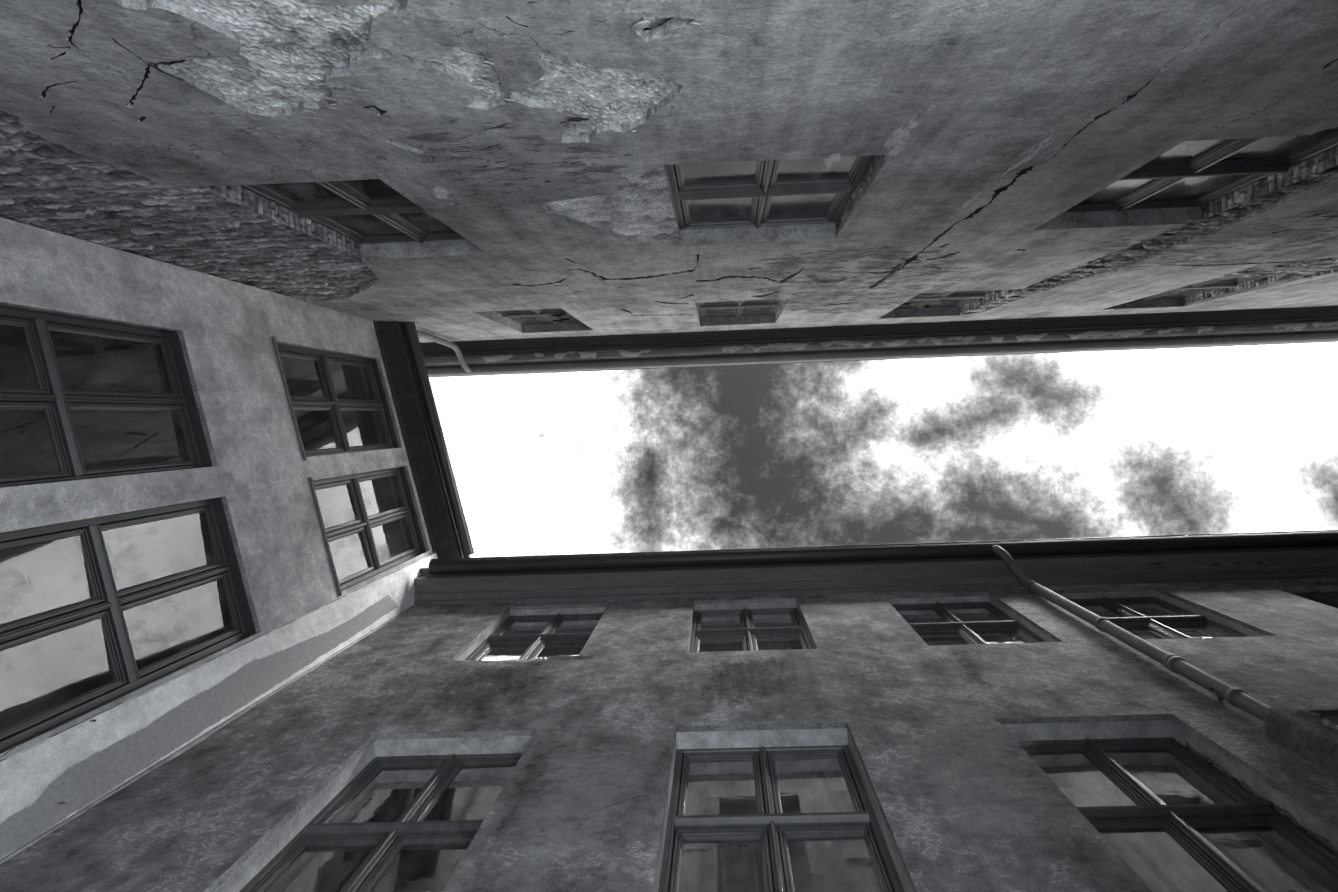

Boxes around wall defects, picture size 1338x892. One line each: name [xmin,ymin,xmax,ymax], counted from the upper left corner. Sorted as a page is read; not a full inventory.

crack [42,0,186,122]
flaking render [165,0,405,114]
flaking render [0,109,383,299]
crack [512,250,802,316]
crack [821,0,1249,306]
flaking render [962,161,1338,314]
crack [1159,213,1336,266]